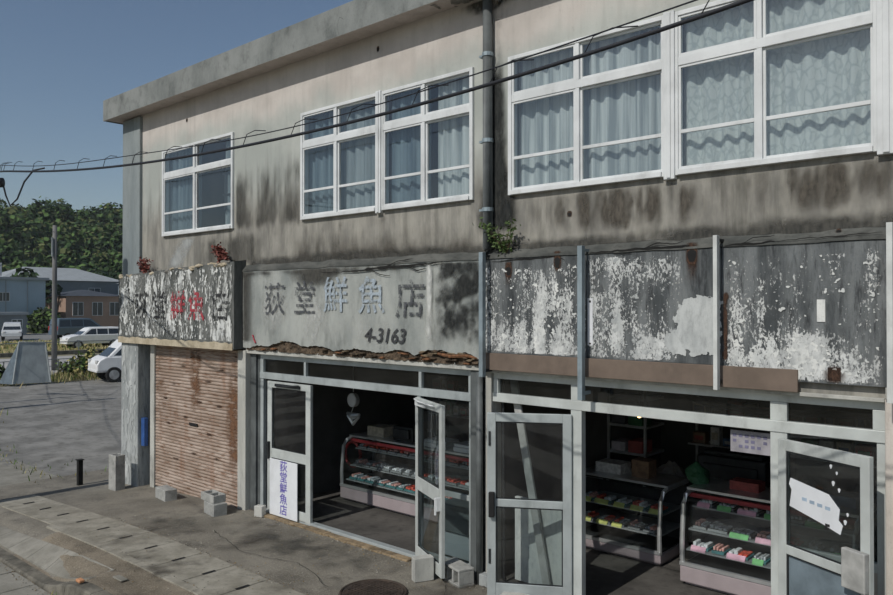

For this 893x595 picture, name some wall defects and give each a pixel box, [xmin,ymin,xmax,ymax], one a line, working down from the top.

damp [481,70,515,229]
damp [661,163,893,241]
peeling [122,346,136,484]
peeling [119,260,232,342]
corrosion [181,350,210,405]
corrosion [217,388,238,461]
spalling [247,341,479,366]
damp [232,182,659,340]
peeling [486,248,882,385]